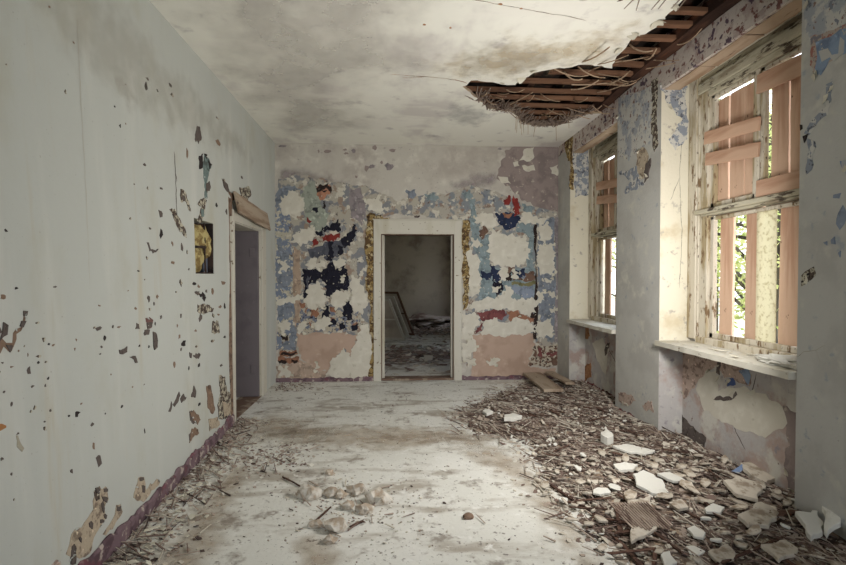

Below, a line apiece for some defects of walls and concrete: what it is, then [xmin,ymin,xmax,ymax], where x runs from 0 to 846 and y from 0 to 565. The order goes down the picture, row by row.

peeling [802,0,846,81]
peeling [616,77,689,194]
peeling [800,81,833,175]
peeling [0,311,48,374]
peeling [158,154,251,443]
peeling [275,190,389,381]
peeling [461,136,589,367]
peeling [585,327,610,380]
peeling [680,353,796,493]
peeling [52,486,123,565]
peeling [133,477,160,502]